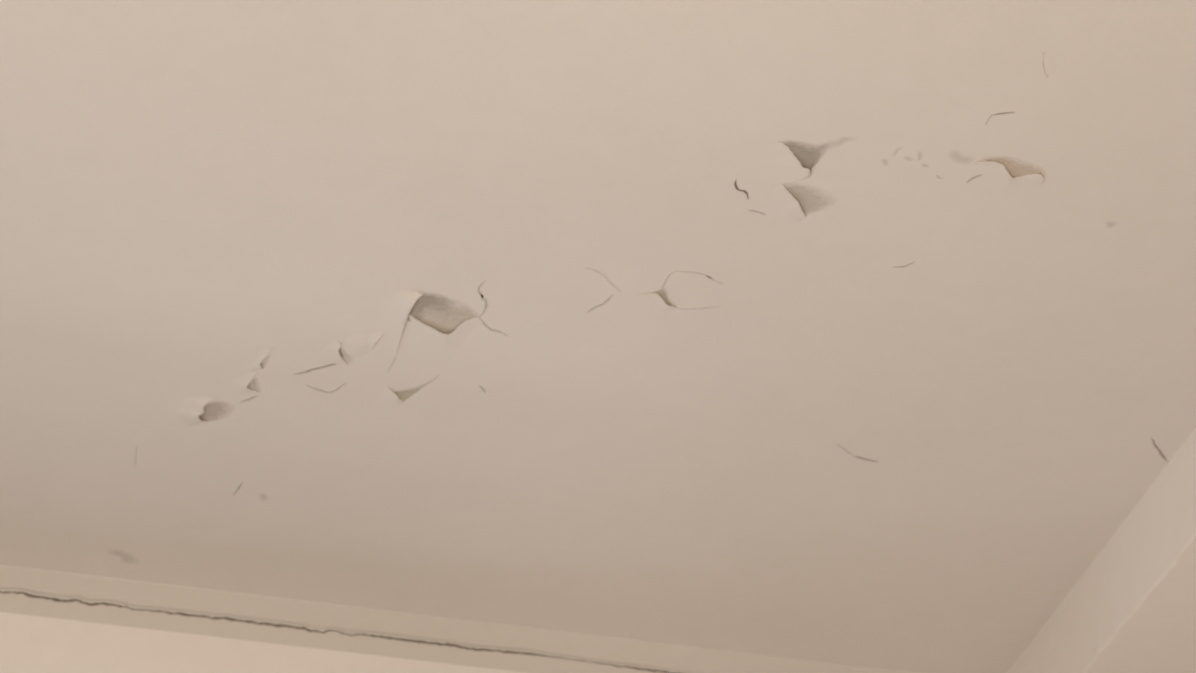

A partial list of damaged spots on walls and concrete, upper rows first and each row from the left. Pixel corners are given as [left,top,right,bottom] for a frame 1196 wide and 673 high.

peeling [373,280,509,408]